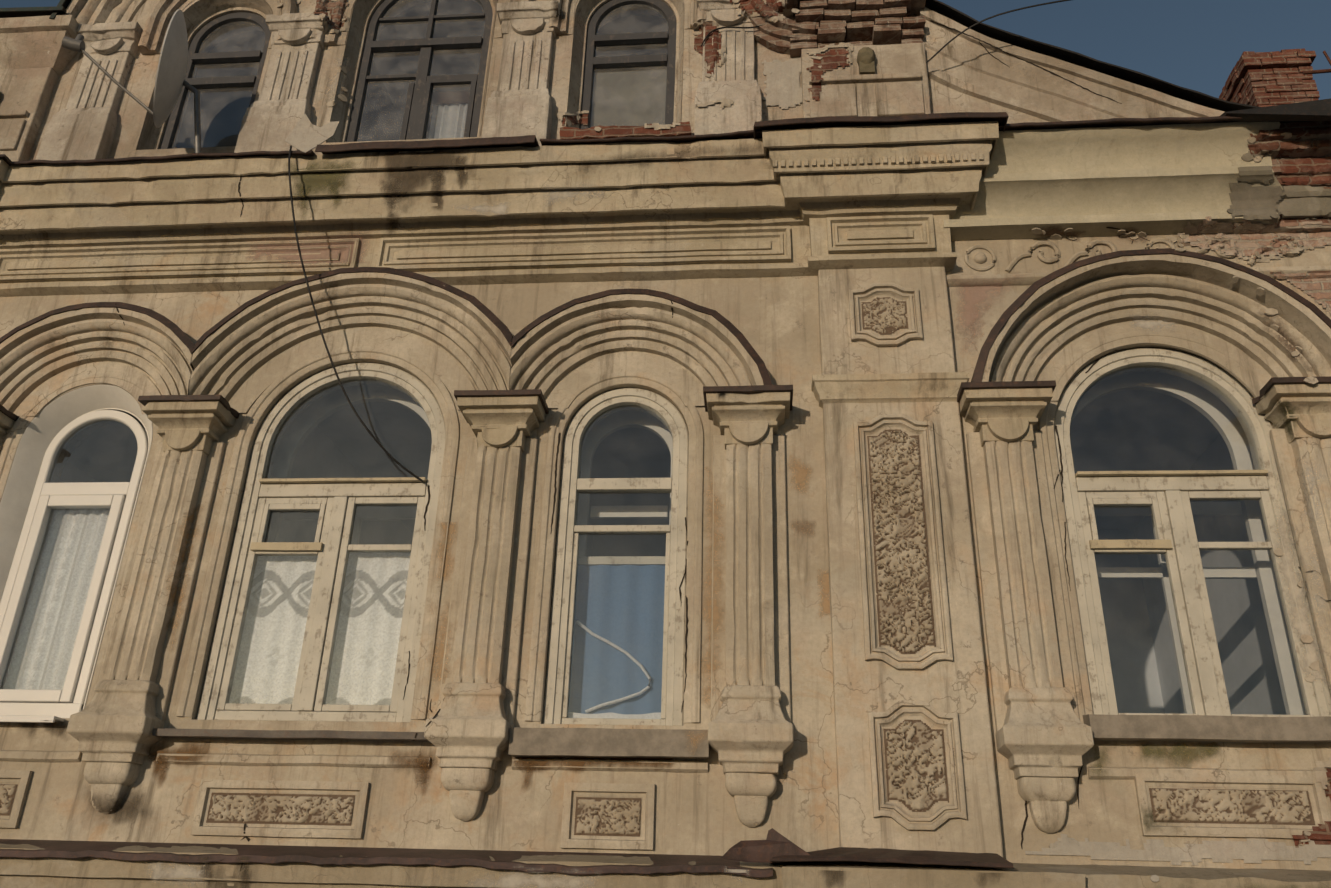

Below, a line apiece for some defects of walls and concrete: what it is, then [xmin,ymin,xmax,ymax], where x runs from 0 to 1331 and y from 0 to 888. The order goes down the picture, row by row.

spalling [730,0,800,23]
spalling [692,19,726,78]
spalling [798,42,854,102]
spalling [556,110,601,132]
spalling [1241,128,1331,187]
leakage [379,149,466,231]
peeling [1117,229,1147,241]
spalling [1166,208,1331,314]
crack [1054,426,1071,591]
crack [679,517,689,713]
spalling [1313,757,1331,800]
peeling [1025,821,1331,882]